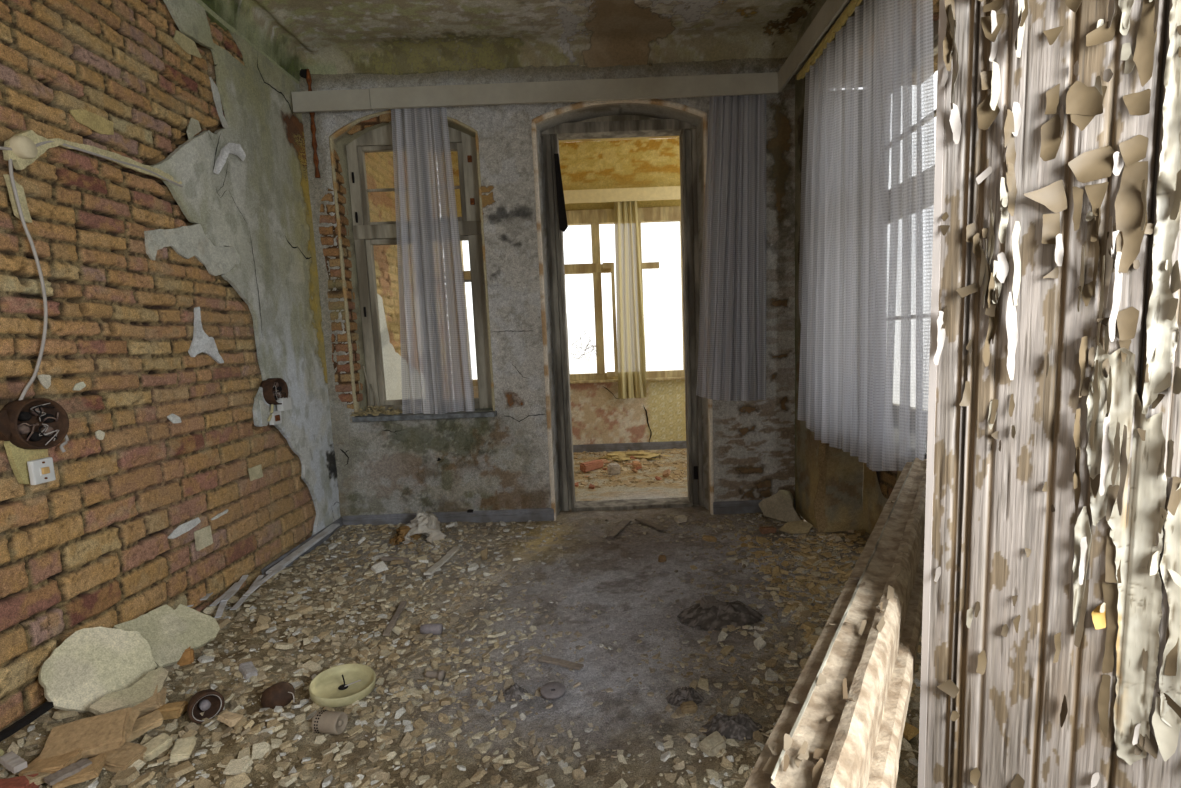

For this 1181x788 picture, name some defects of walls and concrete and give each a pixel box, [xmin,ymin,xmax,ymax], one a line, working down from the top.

damp [201,0,239,43]
damp [355,33,522,75]
peeling [582,0,675,68]
peeling [941,0,962,144]
spalling [347,114,394,135]
peeling [940,212,950,235]
spalling [319,150,363,409]
spalling [0,0,316,730]
peeling [933,305,948,365]
peeling [956,0,1181,765]
peeling [937,680,960,721]
peeling [1011,774,1025,788]